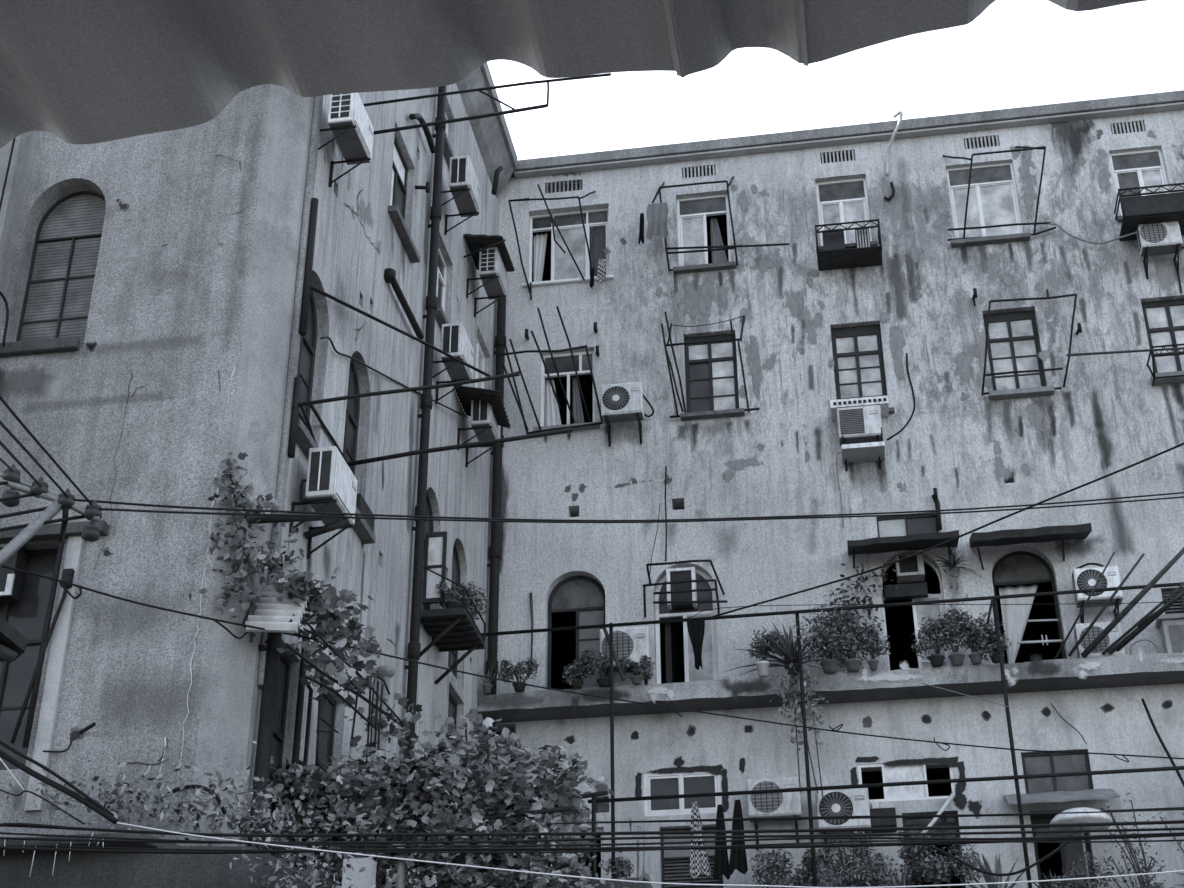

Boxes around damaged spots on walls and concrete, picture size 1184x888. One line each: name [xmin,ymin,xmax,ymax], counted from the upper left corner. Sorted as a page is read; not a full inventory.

water stain [1053,127,1088,164]
water stain [961,246,986,262]
water stain [1008,241,1046,264]
water stain [880,254,920,319]
water stain [1093,393,1111,467]
water stain [1163,384,1184,443]
water stain [1111,489,1130,552]
crack [118,474,218,775]